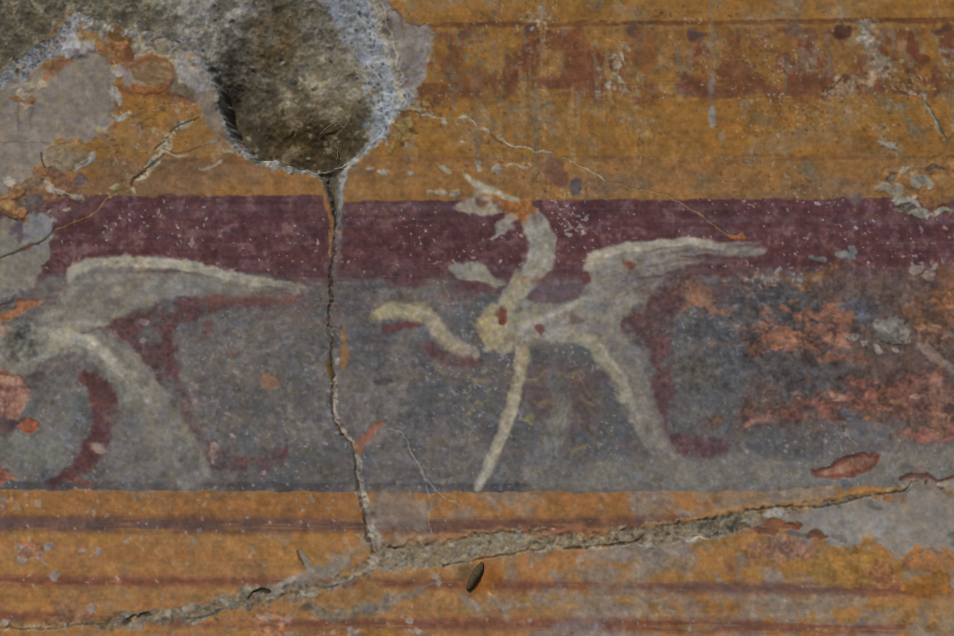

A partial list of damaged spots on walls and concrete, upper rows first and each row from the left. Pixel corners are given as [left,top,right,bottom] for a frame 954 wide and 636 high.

crack [0,117,234,261]
spalling [0,0,434,345]
crack [421,112,747,241]
peeling [908,260,937,282]
spalling [747,295,864,363]
spalling [918,301,954,359]
crack [0,160,954,631]
spalling [748,370,954,447]
flaking render [758,493,954,596]